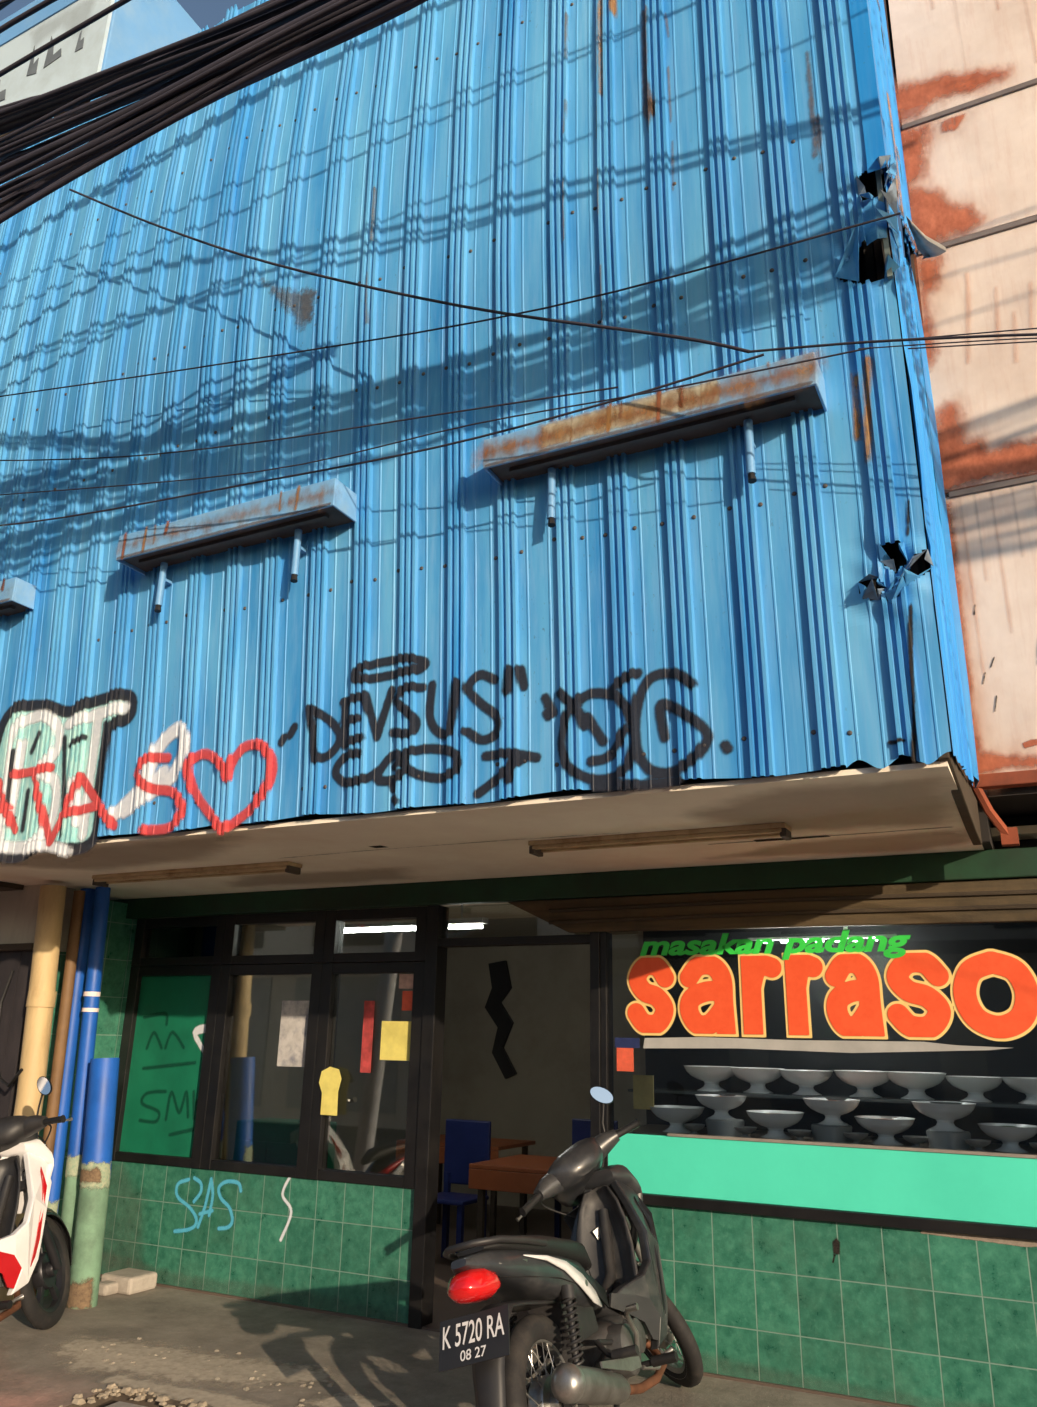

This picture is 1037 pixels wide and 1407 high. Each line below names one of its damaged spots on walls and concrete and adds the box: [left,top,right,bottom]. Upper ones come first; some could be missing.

rust [598,0,617,72]
peeling [835,217,859,281]
rust [878,71,1007,362]
leakage [301,290,312,321]
rust [483,353,818,466]
rust [854,356,871,461]
rust [117,486,331,559]
peeling [858,543,934,604]
rust [936,403,1037,774]
peeling [65,1155,112,1189]
peeling [66,1278,93,1309]
spalling [53,1336,395,1407]